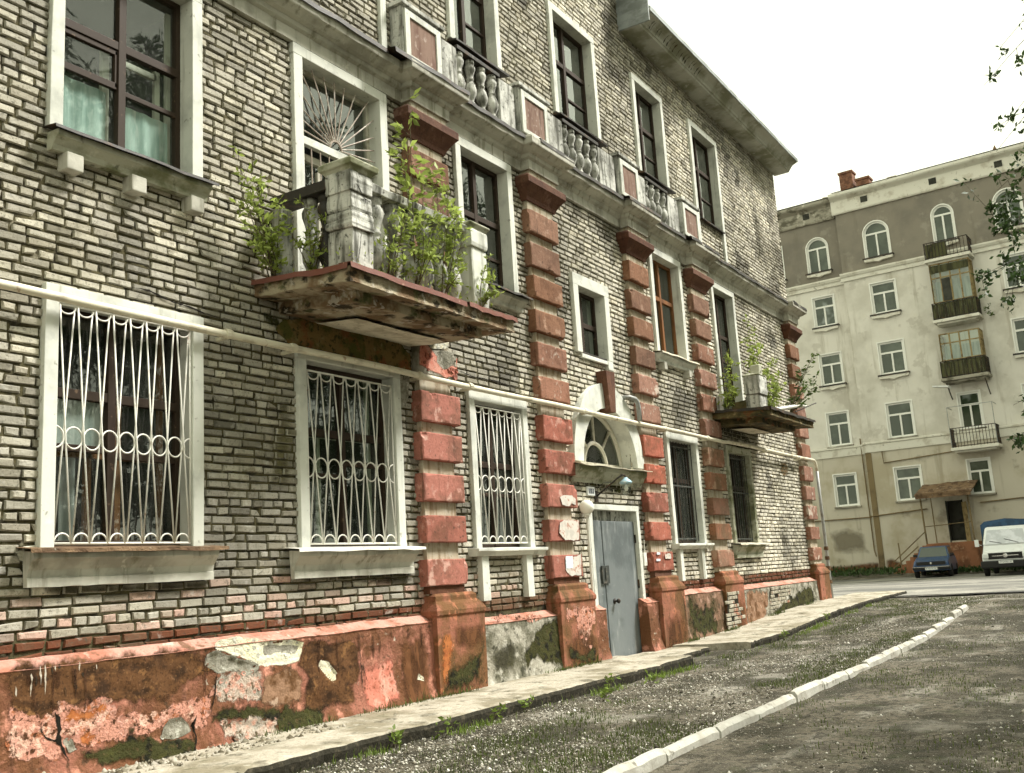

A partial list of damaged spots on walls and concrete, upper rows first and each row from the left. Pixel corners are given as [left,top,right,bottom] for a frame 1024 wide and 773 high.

flaking render [411,342,458,380]
water stain [835,532,863,550]
peeling [566,605,596,649]
flaking render [319,660,337,681]
peeling [5,636,304,762]
crack [41,712,69,760]